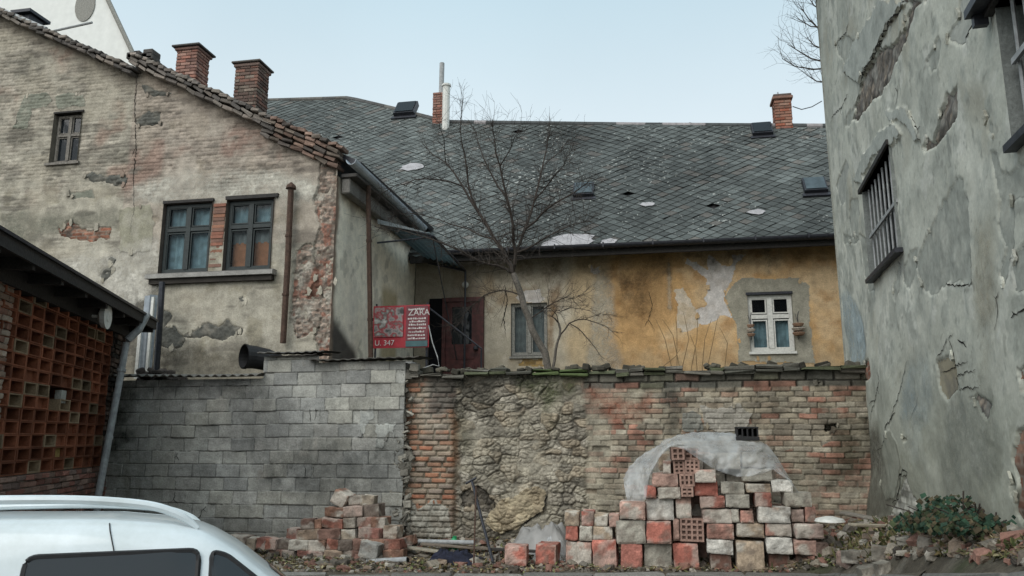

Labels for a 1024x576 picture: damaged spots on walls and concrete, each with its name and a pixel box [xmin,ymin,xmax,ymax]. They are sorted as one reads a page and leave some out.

flaking render [846,0,921,126]
peeling [66,170,127,199]
crack [130,78,138,227]
flaking render [924,92,958,151]
peeling [58,204,155,283]
peeling [161,310,243,352]
flaking render [290,160,338,362]
peeling [674,254,746,333]
crack [937,334,979,390]
crack [870,364,917,455]
peeling [403,459,496,539]